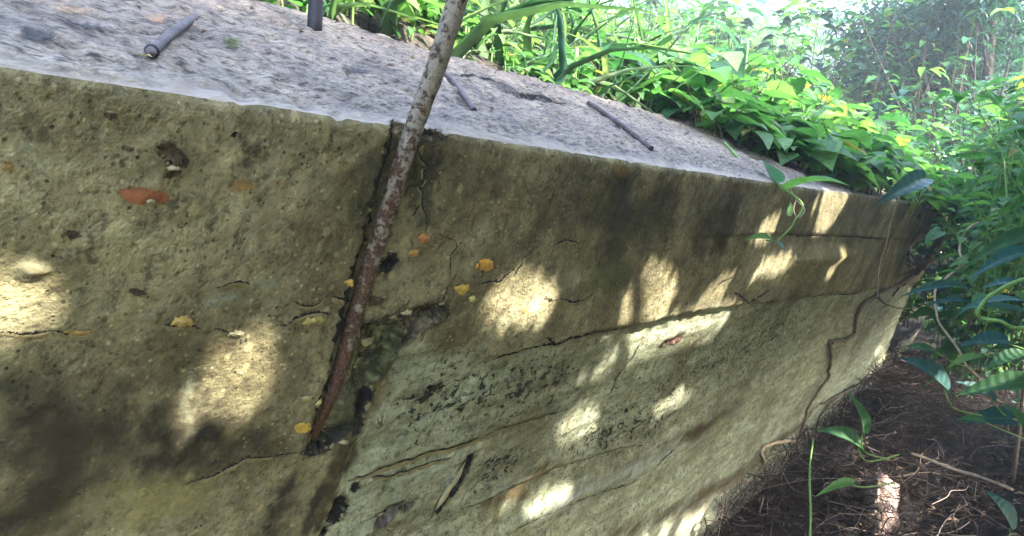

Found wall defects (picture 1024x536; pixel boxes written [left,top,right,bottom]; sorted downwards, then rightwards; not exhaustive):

crack [405,148,459,302]
crack [0,330,62,341]
crack [183,119,394,486]
crack [493,324,640,393]
crack [545,293,594,308]
crack [714,277,770,307]